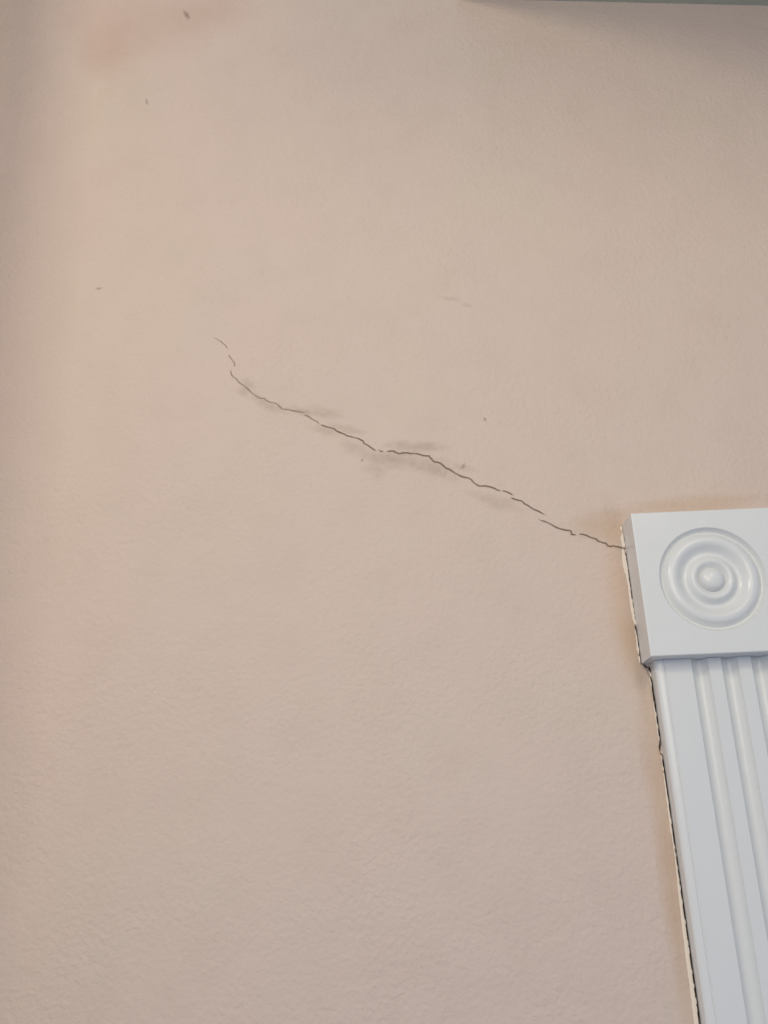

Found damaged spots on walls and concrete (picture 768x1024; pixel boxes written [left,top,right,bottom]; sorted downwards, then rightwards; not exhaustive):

crack [217,339,701,1024]